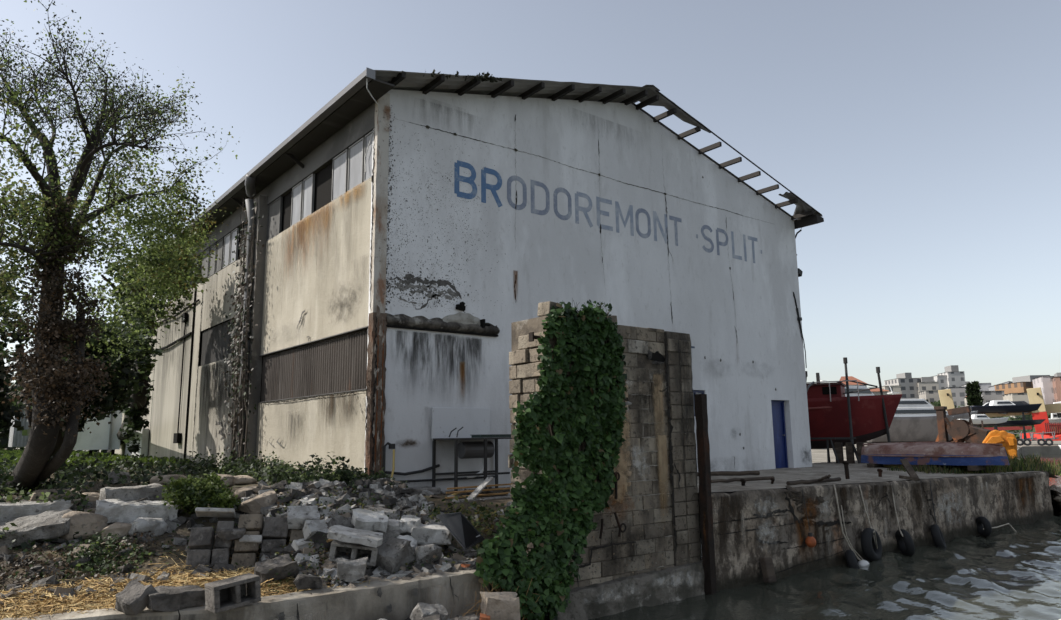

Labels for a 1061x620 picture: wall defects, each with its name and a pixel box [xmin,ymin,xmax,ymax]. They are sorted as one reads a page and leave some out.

spalling [371,105,503,475]